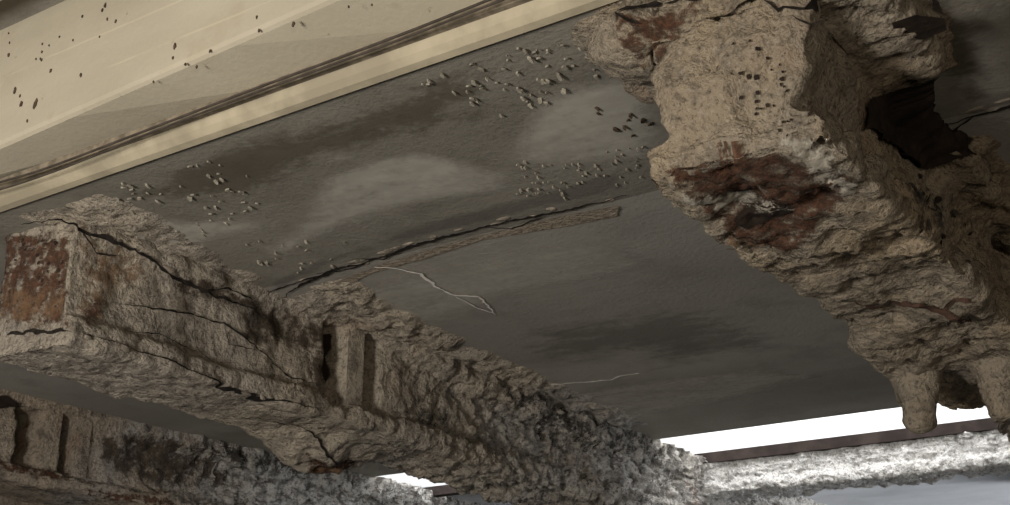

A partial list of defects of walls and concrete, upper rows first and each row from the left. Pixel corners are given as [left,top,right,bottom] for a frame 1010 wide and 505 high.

crack [764,0,828,25]
damp [141,222,255,243]
damp [147,82,475,195]
damp [276,155,501,251]
damp [522,85,653,161]
corrosion [665,160,720,185]
corrosion [780,138,836,163]
spalling [863,79,977,179]
corrosion [0,230,154,327]
crack [7,195,622,464]
peeling [0,396,19,409]